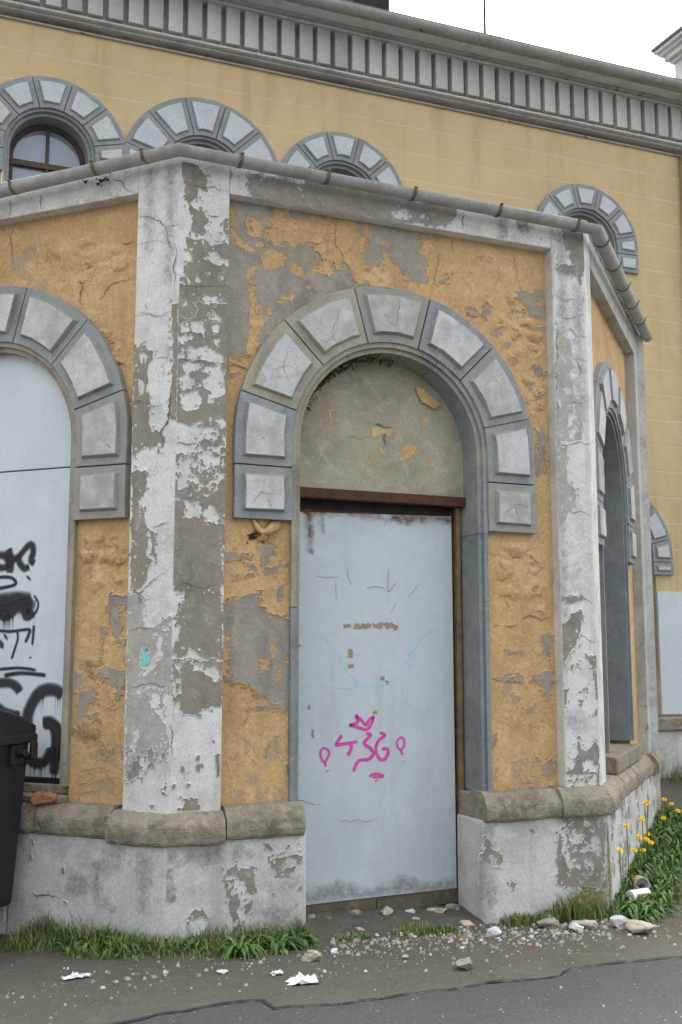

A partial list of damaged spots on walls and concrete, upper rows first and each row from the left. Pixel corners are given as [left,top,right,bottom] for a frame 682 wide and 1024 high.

crack [122,216,225,333]
peeling [555,230,584,286]
peeling [465,286,586,532]
peeling [73,162,458,785]
peeling [149,739,221,811]
peeling [513,735,600,788]
flaking render [185,906,210,928]
flaking render [221,842,304,924]
flaking render [477,834,507,870]